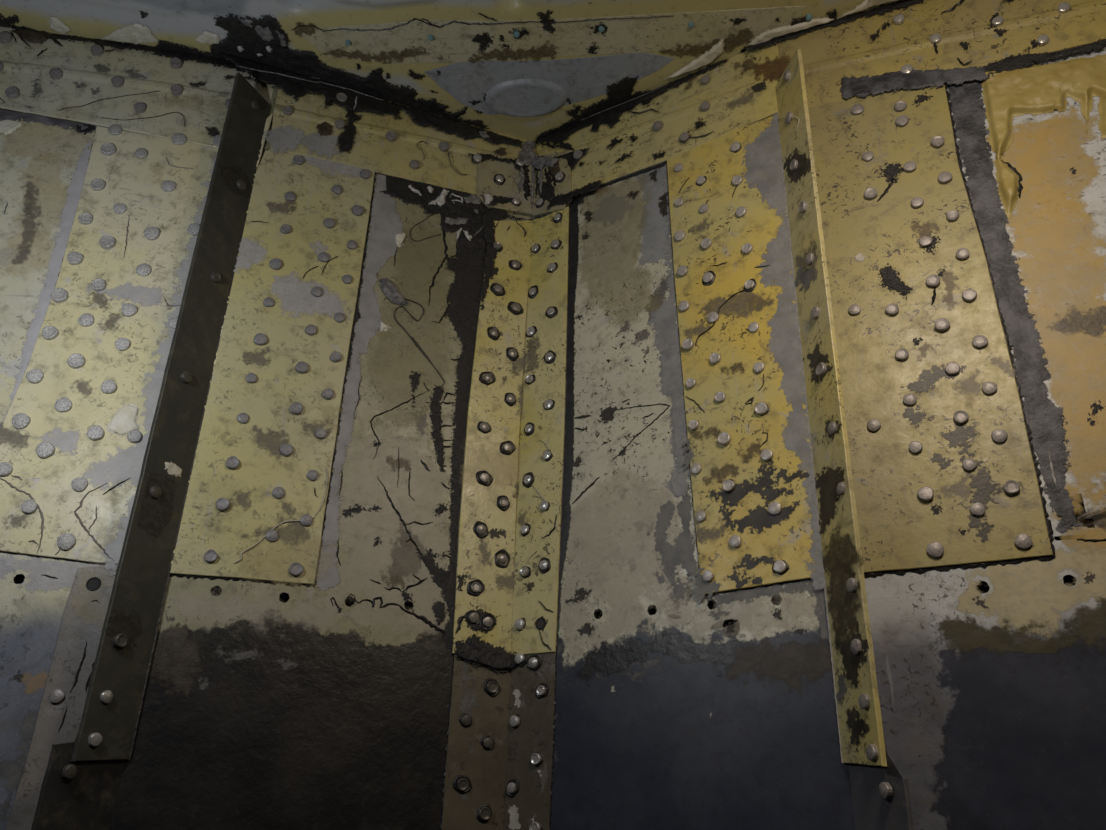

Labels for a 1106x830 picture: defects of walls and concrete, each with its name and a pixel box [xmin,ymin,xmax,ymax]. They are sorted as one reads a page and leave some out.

peeling [101,11,158,53]
peeling [471,28,529,52]
peeling [537,10,556,34]
peeling [663,39,724,80]
peeling [748,0,897,50]
peeling [264,122,372,178]
peeling [598,135,639,166]
peeling [980,54,1106,219]
peeling [408,184,481,241]
peeling [658,192,669,217]
peeling [233,236,267,273]
damp [577,630,743,686]